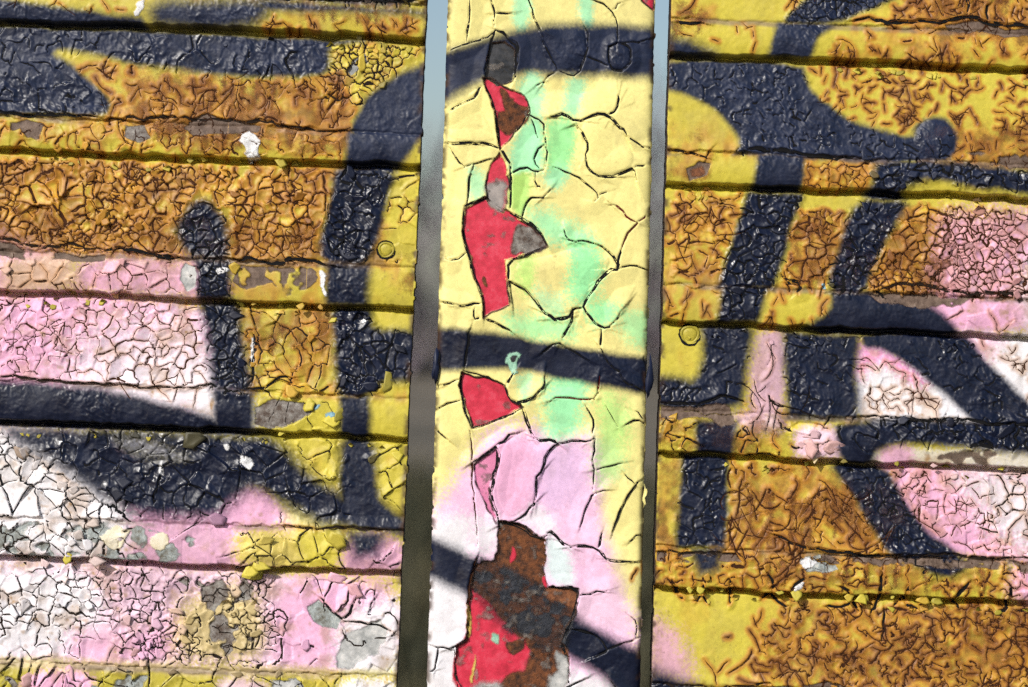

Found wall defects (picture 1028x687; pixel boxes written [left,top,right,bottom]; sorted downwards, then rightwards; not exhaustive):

peeling [462,41,548,319]
crack [430,0,1028,687]
peeling [0,521,194,567]
peeling [177,562,272,656]
peeling [114,675,148,687]
peeling [272,678,304,687]